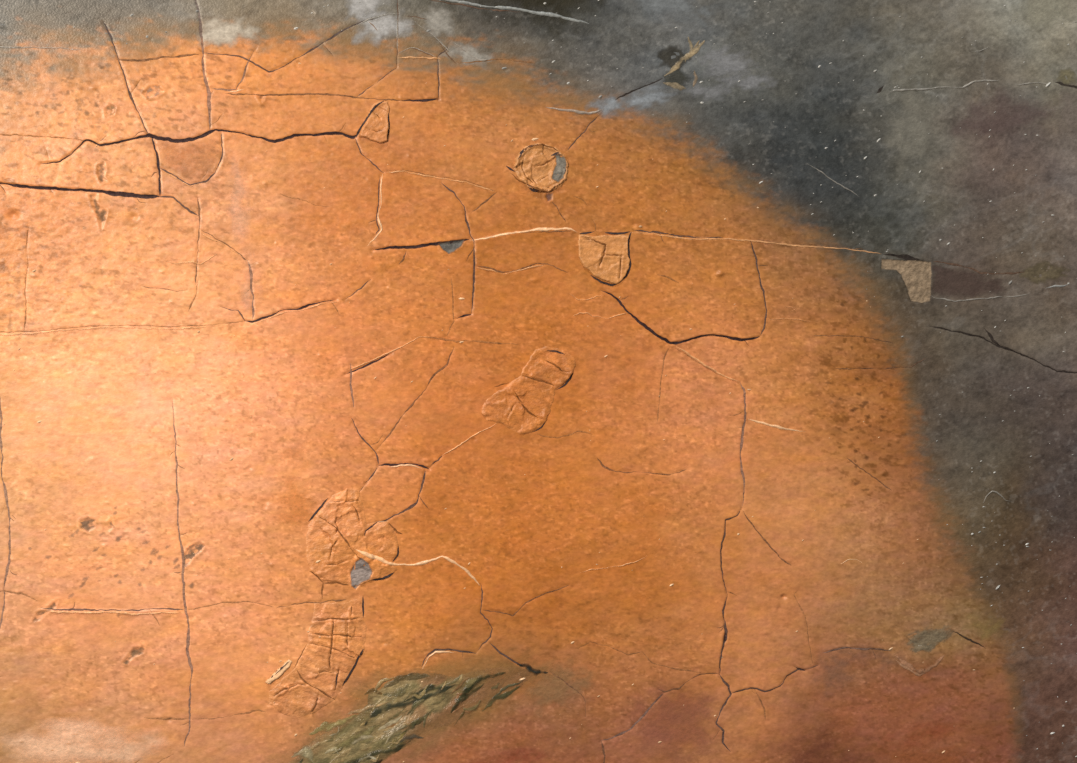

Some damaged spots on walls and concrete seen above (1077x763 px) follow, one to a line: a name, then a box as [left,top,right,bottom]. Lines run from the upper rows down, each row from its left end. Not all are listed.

crack [568,77,665,149]
crack [876,80,1077,94]
peeling [578,231,631,286]
peeling [881,259,932,303]
crack [0,0,596,668]
crack [539,431,686,475]
crack [580,230,1077,763]
crack [0,398,346,763]
peeling [265,488,402,718]